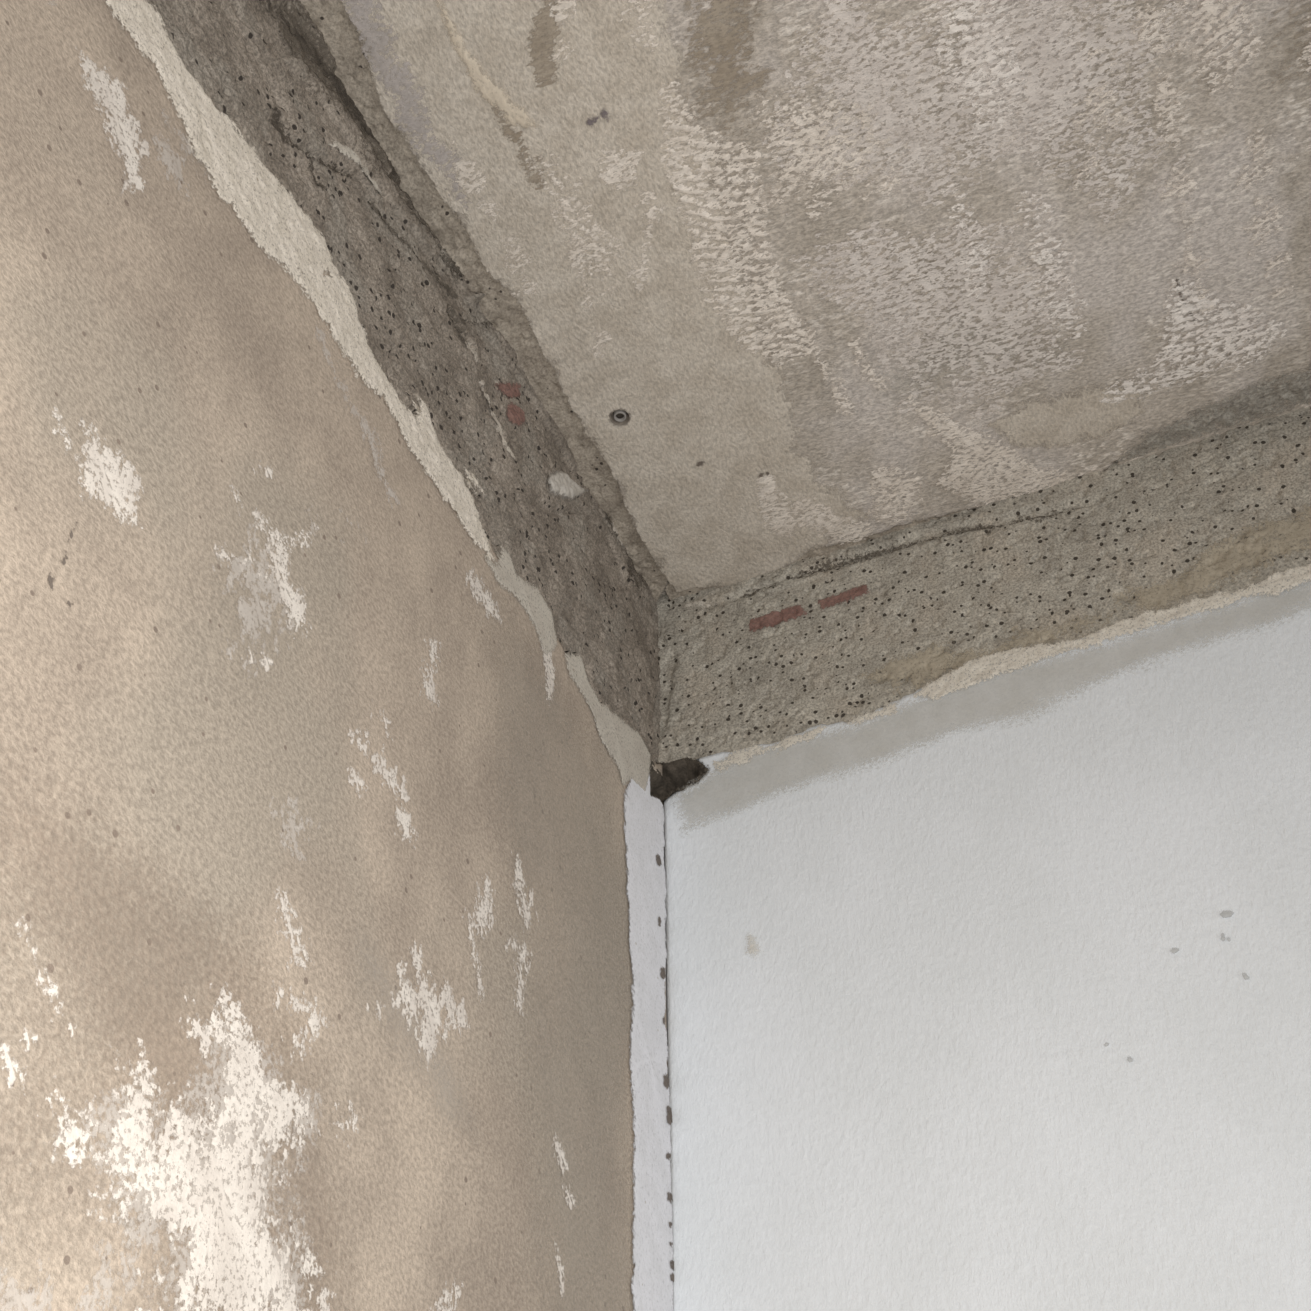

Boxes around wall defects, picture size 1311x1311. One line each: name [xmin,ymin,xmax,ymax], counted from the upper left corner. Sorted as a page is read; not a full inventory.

peeling [52,407,144,529]
spalling [75,0,1311,807]